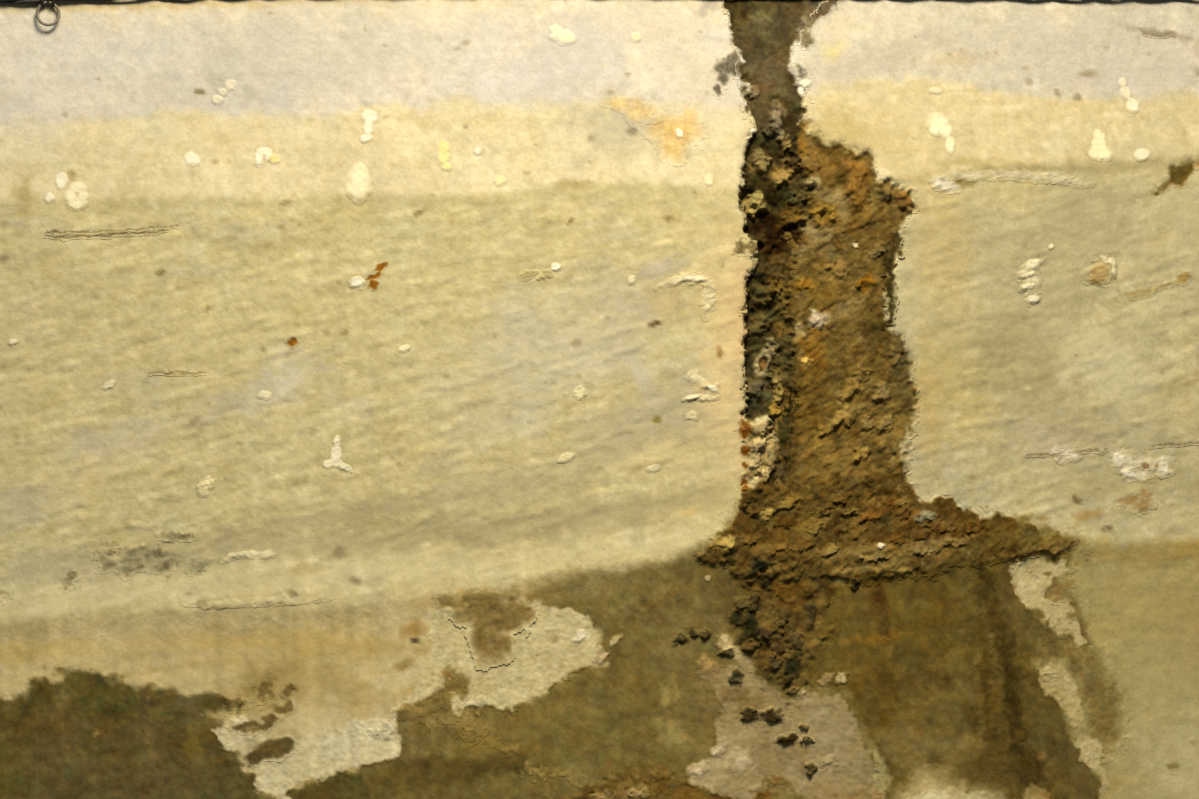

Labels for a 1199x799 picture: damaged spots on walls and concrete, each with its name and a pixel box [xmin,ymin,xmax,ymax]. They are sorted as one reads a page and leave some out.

rust [364,261,389,291]
rust [733,417,756,495]
spalling [671,118,1096,799]
leakage [0,500,746,799]
peeling [208,598,625,799]
leakage [806,508,1131,799]
peeling [1034,655,1110,797]